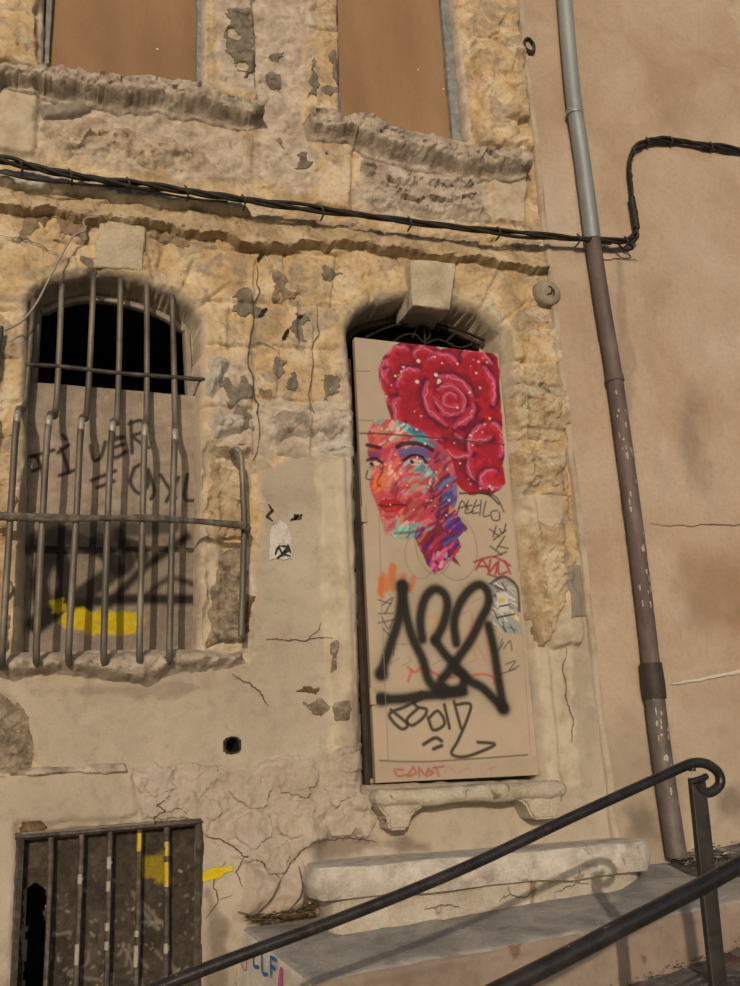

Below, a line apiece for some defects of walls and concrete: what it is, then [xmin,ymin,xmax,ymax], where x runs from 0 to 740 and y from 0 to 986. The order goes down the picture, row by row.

crack [652,521,740,529]
spalling [205,460,256,648]
crack [266,623,331,642]
spalling [330,640,339,673]
spalling [296,686,352,721]
crack [562,649,574,738]
spalling [0,694,34,776]
crack [153,796,186,824]
crack [202,833,375,918]